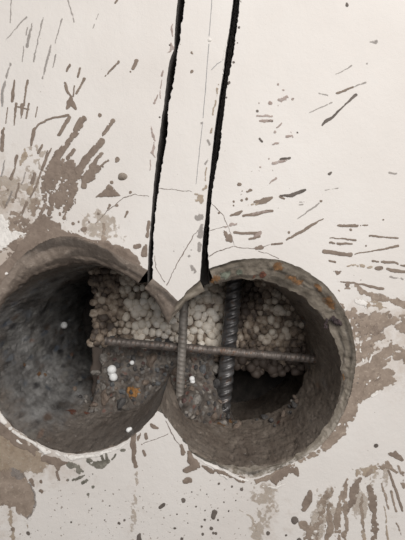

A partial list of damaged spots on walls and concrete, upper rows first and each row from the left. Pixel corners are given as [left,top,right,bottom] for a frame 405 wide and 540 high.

damp [30,114,87,160]
damp [74,118,115,174]
damp [5,144,52,215]
peeling [0,214,26,250]
crack [155,230,198,285]
spalling [87,279,316,426]
damp [0,436,49,540]
spalling [0,413,129,461]
spalling [180,444,249,482]
damp [247,281,405,540]